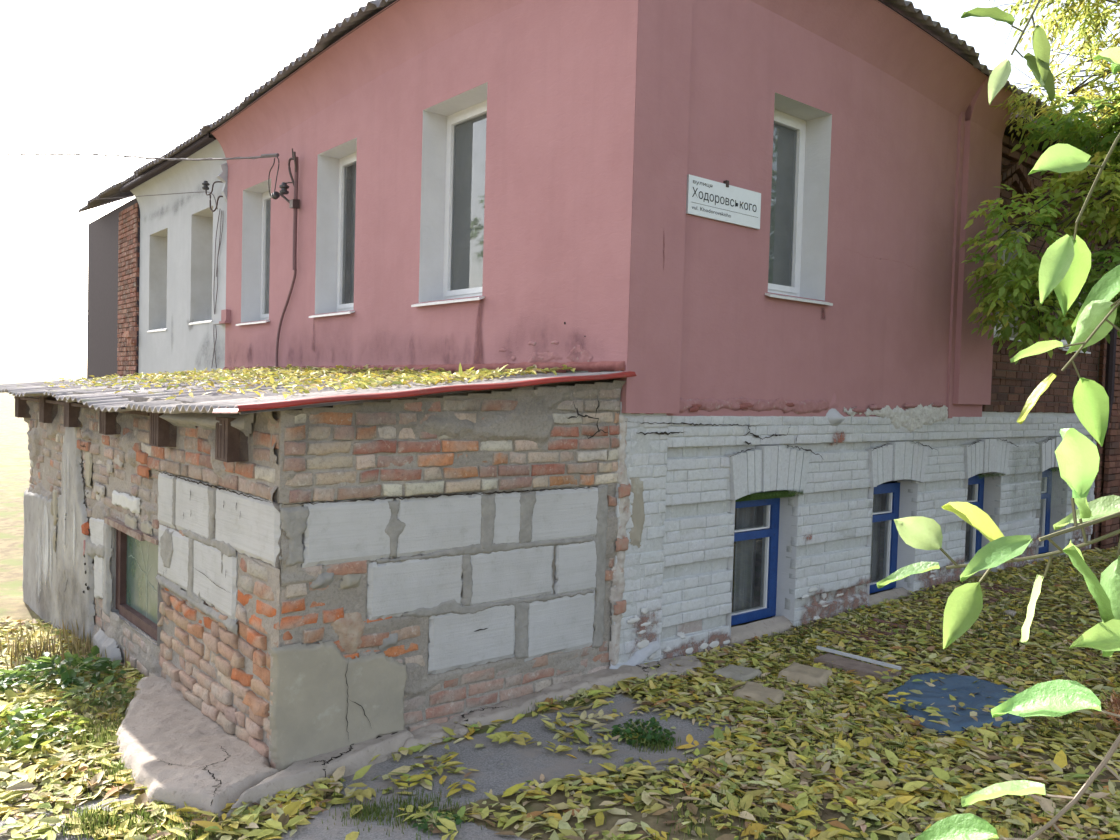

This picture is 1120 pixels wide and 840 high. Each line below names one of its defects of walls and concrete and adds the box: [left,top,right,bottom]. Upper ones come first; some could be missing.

water stain [474,304,482,364]
crack [568,398,823,459]
flaking render [844,403,948,433]
spalling [81,522,89,593]
peeling [799,579,870,625]
crack [345,659,398,739]